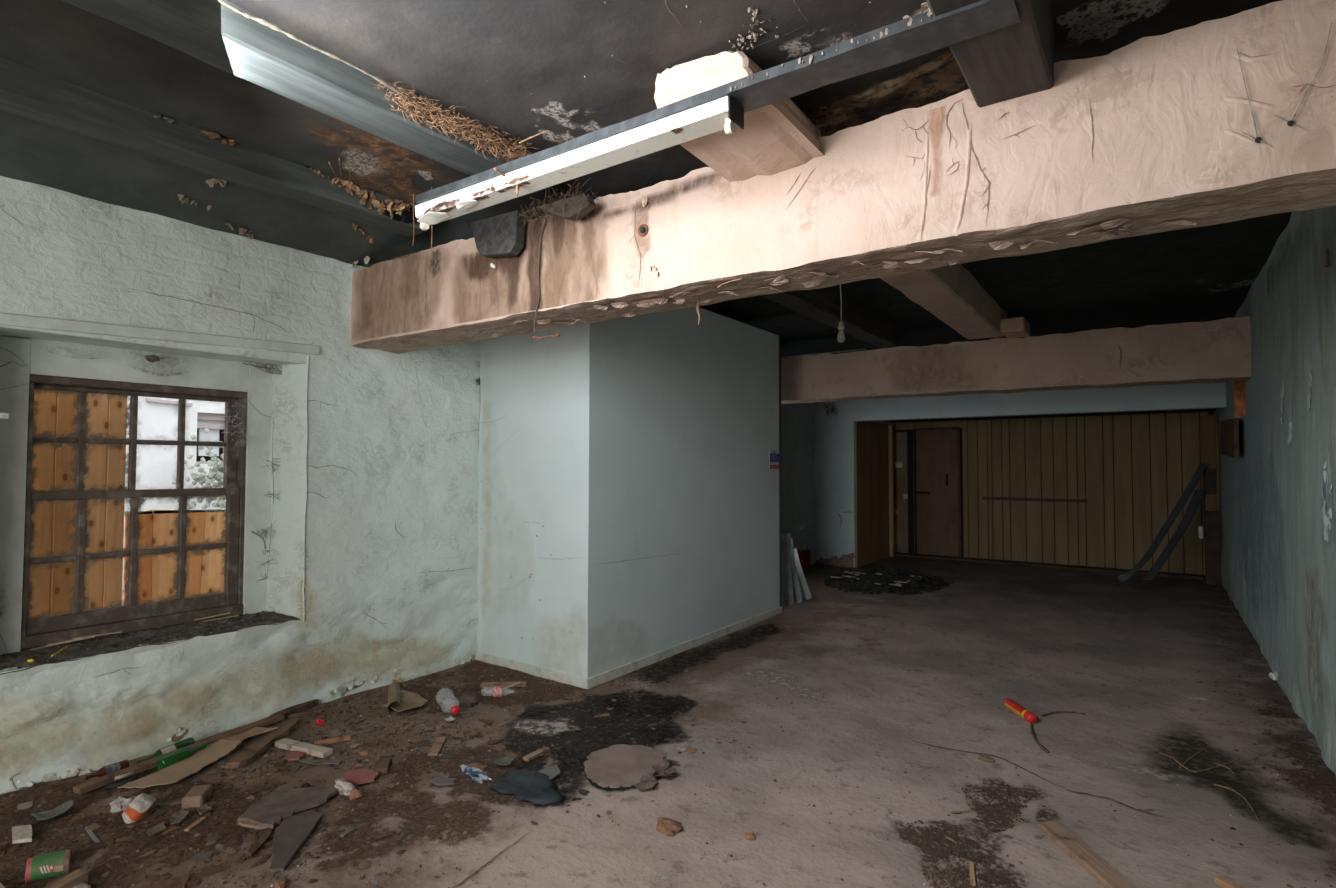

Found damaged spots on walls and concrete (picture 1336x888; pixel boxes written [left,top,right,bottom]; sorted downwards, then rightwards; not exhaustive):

crack [1294,83,1334,93]
rust [930,107,943,192]
peeling [206,178,227,188]
peeling [306,166,416,220]
damp [456,212,603,323]